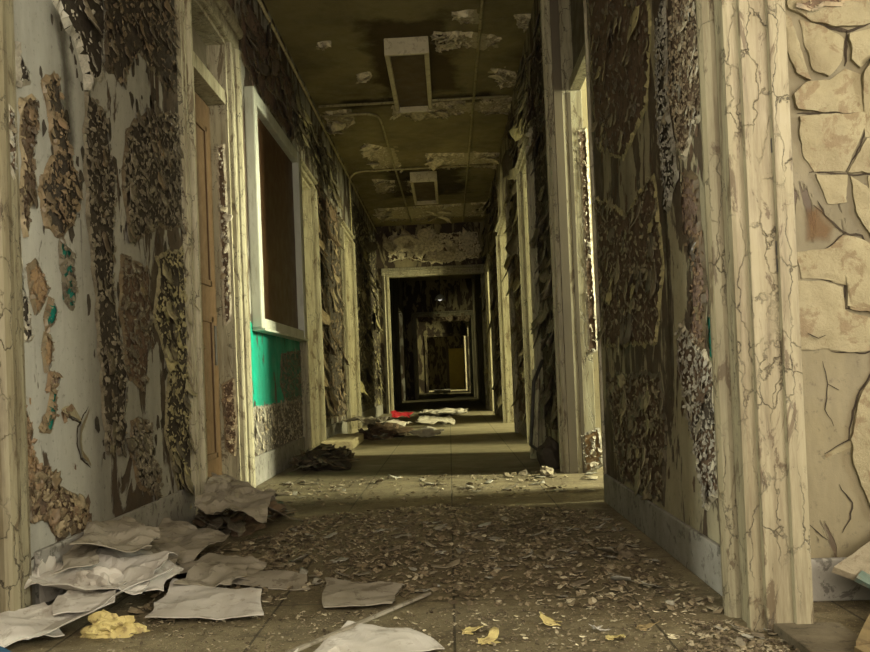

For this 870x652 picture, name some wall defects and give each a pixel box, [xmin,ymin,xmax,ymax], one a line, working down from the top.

crack [816,23,870,66]
crack [797,112,870,176]
peeling [9,0,200,538]
peeling [215,143,233,326]
peeling [227,0,558,432]
crack [814,202,865,249]
crack [818,278,867,312]
peeling [221,378,238,456]
peeling [253,349,304,455]
crack [808,333,870,458]
crack [810,484,853,540]